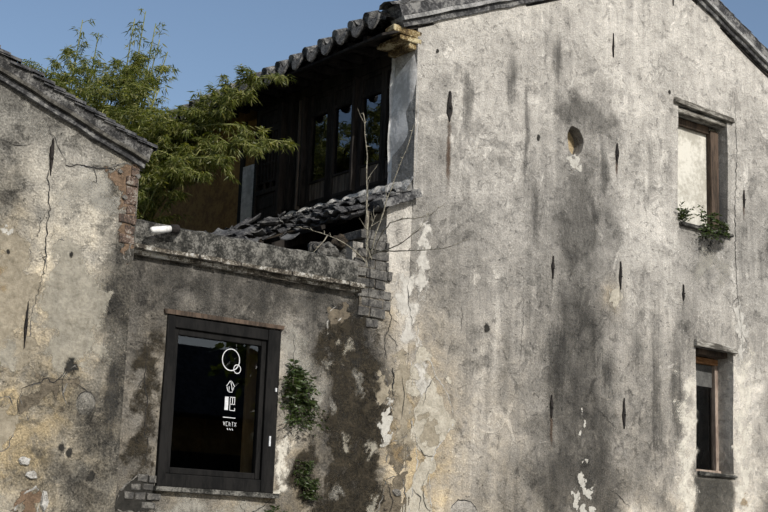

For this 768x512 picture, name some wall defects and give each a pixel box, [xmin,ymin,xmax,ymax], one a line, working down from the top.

crack [28,130,124,320]
flaking render [104,162,142,264]
flaking render [566,154,582,172]
flaking render [0,224,113,512]
flaking render [326,221,456,512]
flaking render [571,473,596,512]
leakage [673,350,765,512]